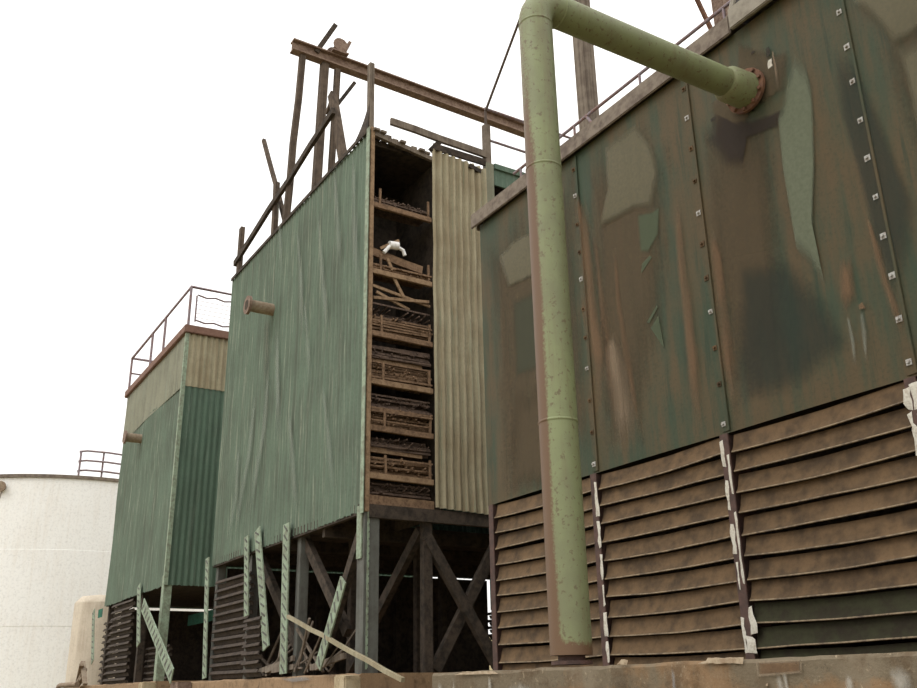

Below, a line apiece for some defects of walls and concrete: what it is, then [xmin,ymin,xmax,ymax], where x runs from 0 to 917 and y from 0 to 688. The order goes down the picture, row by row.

rust [578,207,609,368]